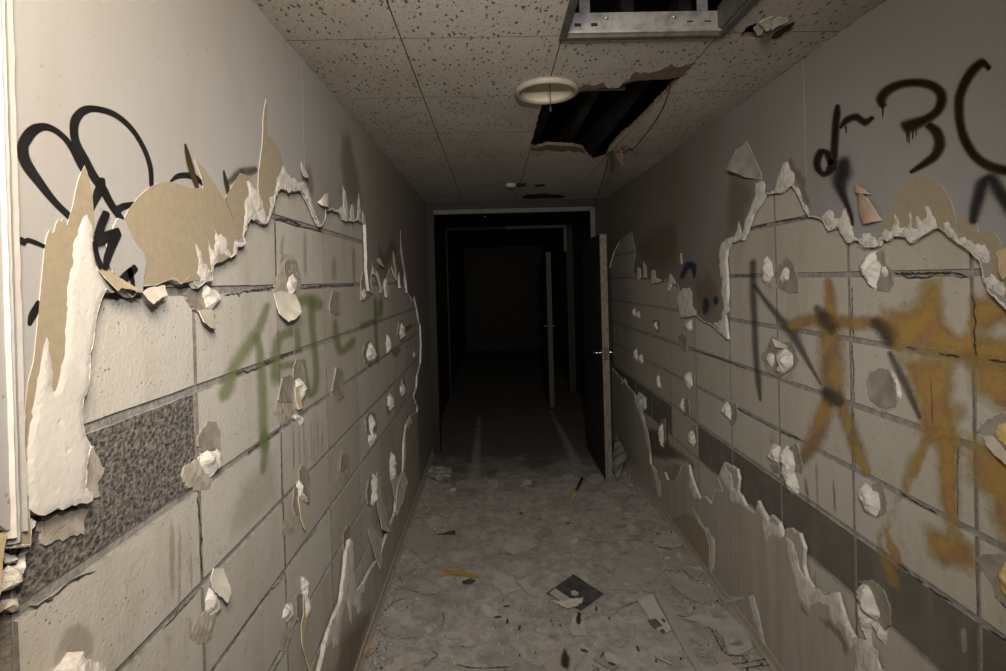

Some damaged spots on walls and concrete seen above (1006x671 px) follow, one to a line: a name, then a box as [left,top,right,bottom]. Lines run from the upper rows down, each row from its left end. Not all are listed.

spalling [753,16,794,44]
spalling [622,61,695,84]
spalling [0,613,12,671]
peeling [682,611,753,655]